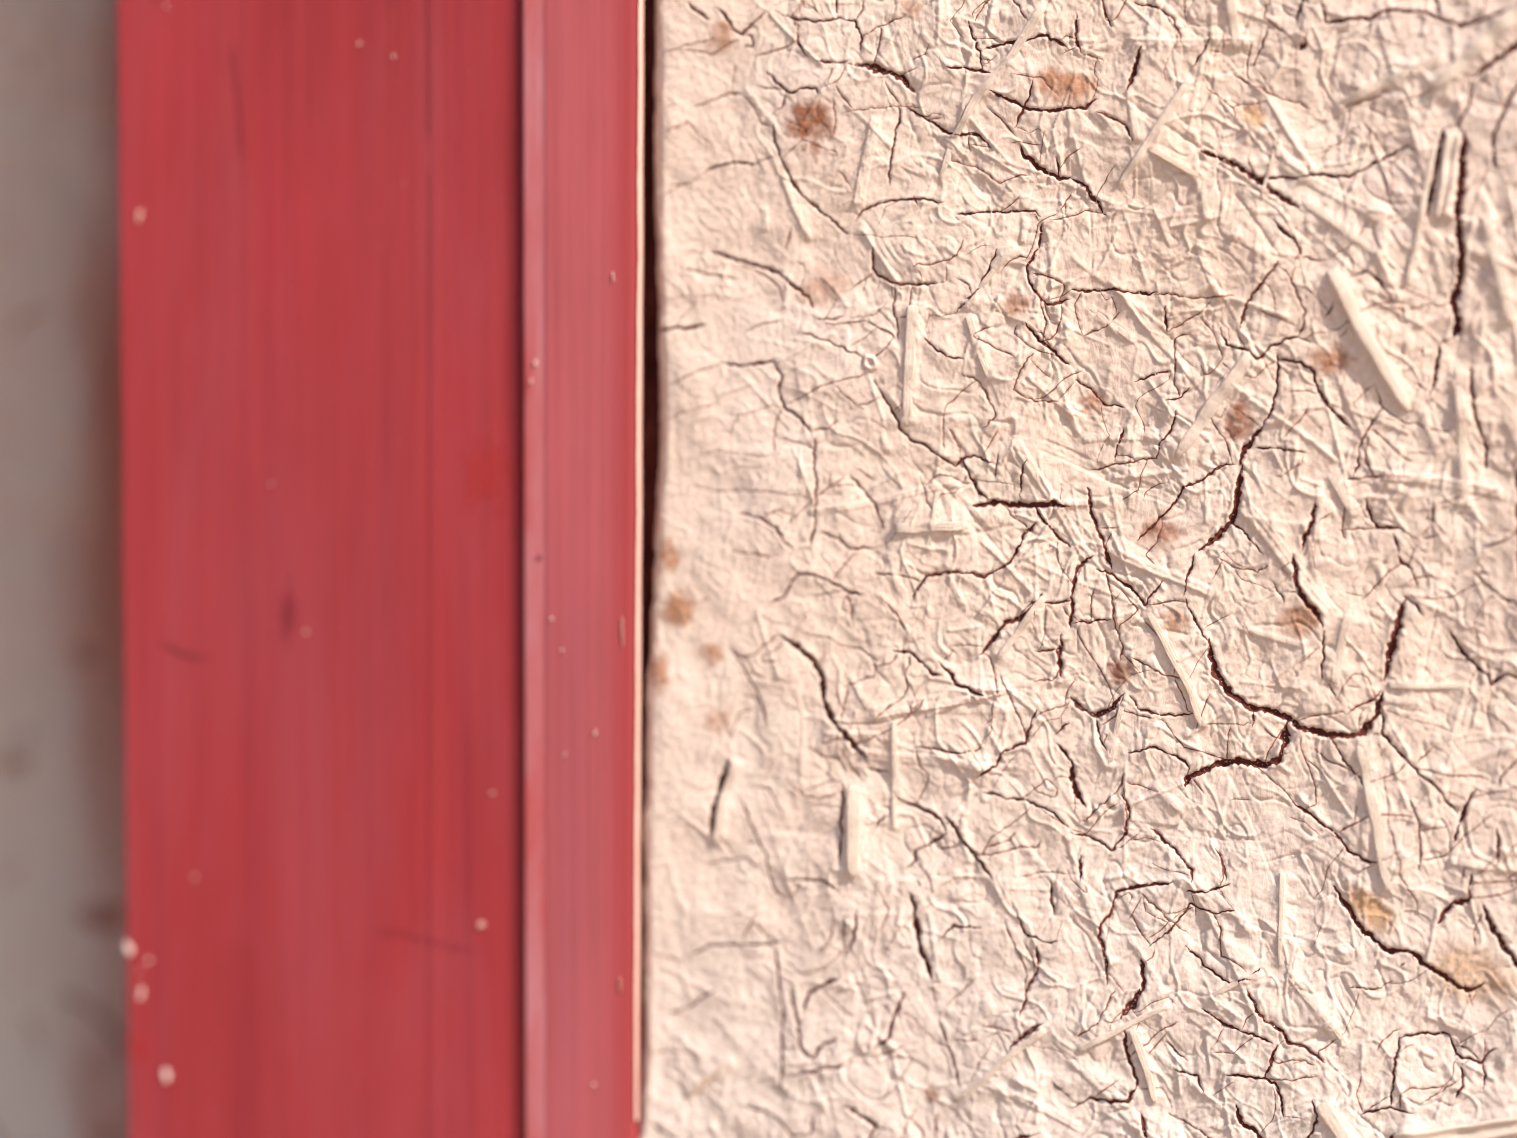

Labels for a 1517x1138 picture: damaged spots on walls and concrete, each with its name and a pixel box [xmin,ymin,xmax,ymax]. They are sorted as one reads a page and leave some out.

crack [641,0,1517,1138]